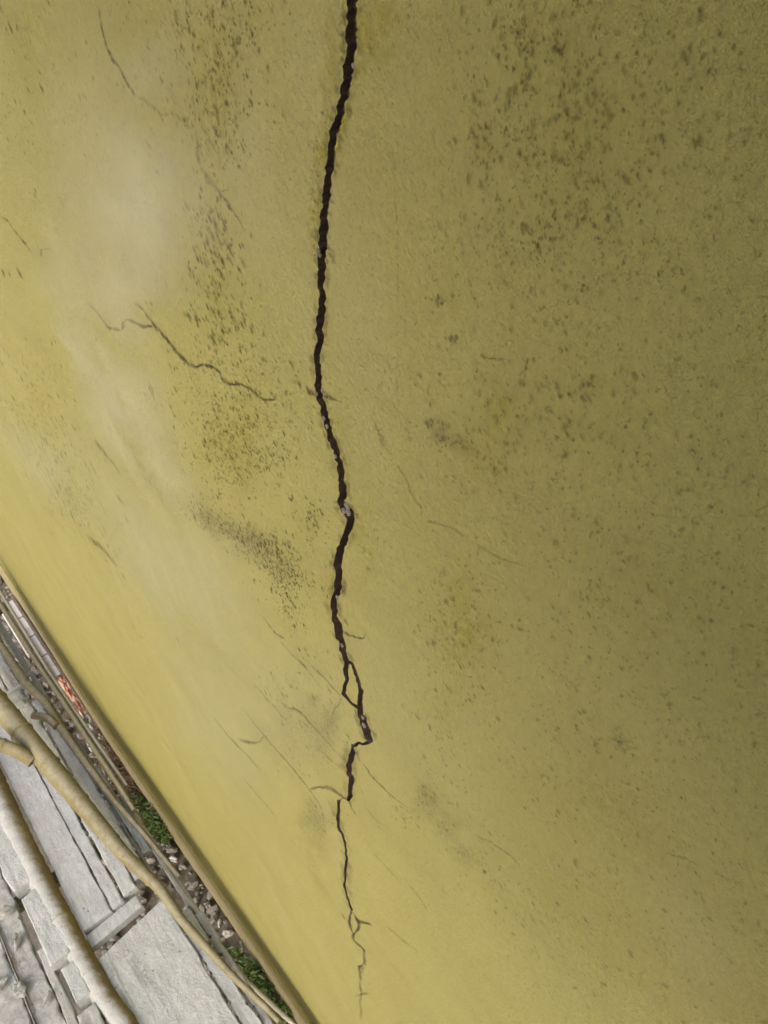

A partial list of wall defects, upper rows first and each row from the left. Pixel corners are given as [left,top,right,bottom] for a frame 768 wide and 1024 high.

crack [92,307,275,401]
crack [299,0,373,971]